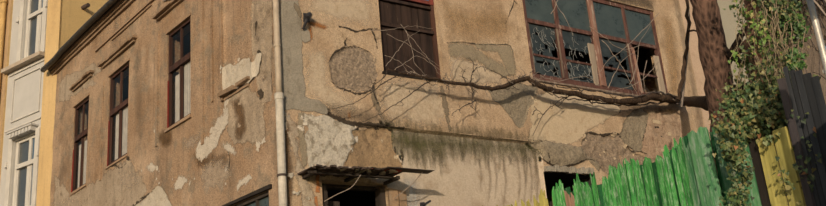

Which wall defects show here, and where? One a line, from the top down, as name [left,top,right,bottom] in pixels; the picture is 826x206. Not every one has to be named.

crack [330,26,378,60]
flaking render [135,160,172,206]
flaking render [172,0,273,194]
flaking render [308,45,378,110]
peeling [284,111,403,206]
crack [327,80,405,165]
flaking render [384,82,444,125]
damp [386,124,541,159]
flaking render [450,57,537,128]
flaking render [581,108,683,175]